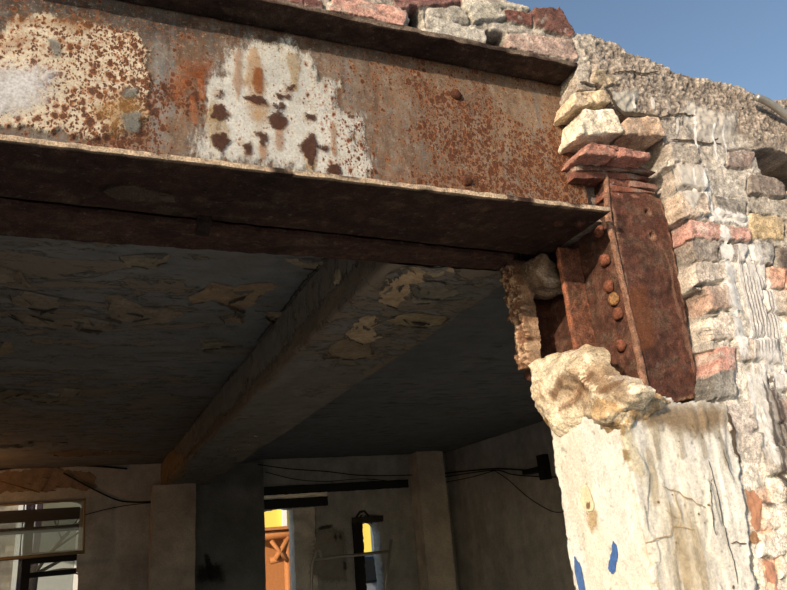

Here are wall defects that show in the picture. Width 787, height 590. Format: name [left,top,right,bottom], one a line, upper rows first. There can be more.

peeling [0,13,152,140]
peeling [191,36,377,178]
efflorescence [612,88,639,112]
damp [675,100,737,162]
peeling [188,282,279,315]
peeling [346,267,455,345]
damp [671,164,787,503]
spalling [591,393,671,475]
crack [646,413,747,583]